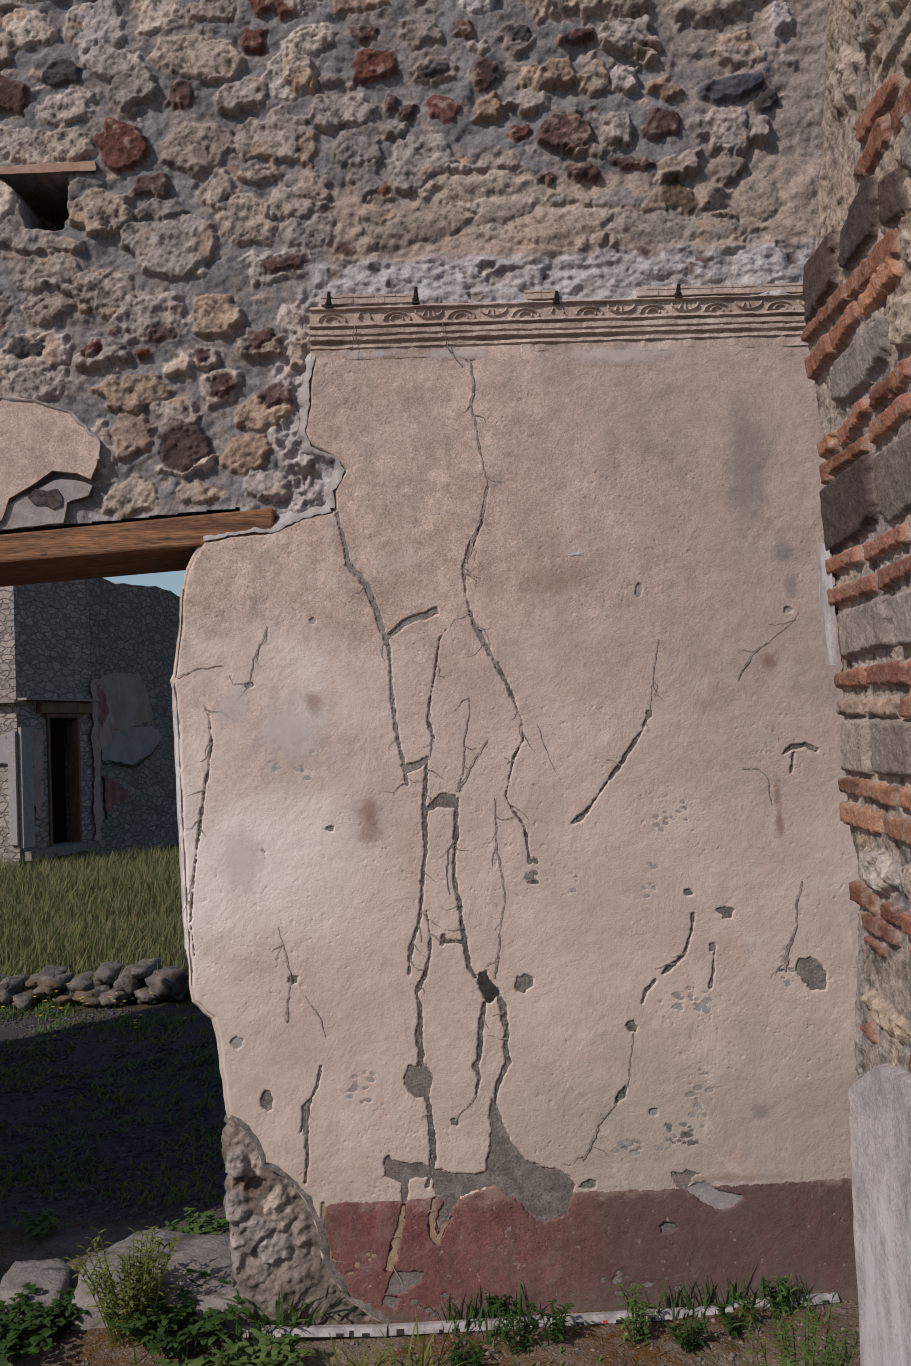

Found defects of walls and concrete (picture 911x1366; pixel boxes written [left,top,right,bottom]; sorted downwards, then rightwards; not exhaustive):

flaking render [27,488,63,510]
crack [104,745,159,768]
crack [175,626,267,956]
crack [335,297,555,1284]
crack [572,639,662,824]
crack [271,927,346,1288]
spalling [384,1099,596,1232]
crack [563,914,715,1165]
spalling [671,1170,742,1210]
spalling [779,946,827,990]